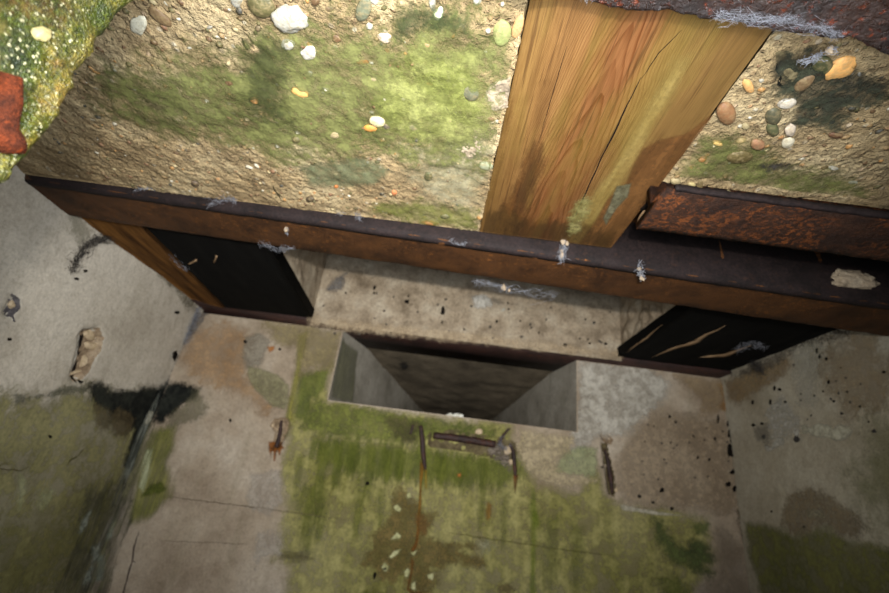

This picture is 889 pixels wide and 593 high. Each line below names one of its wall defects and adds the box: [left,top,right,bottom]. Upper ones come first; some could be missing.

crack [572,36,676,223]
spalling [69,328,105,383]
rust [269,441,283,461]
leakage [36,319,889,593]